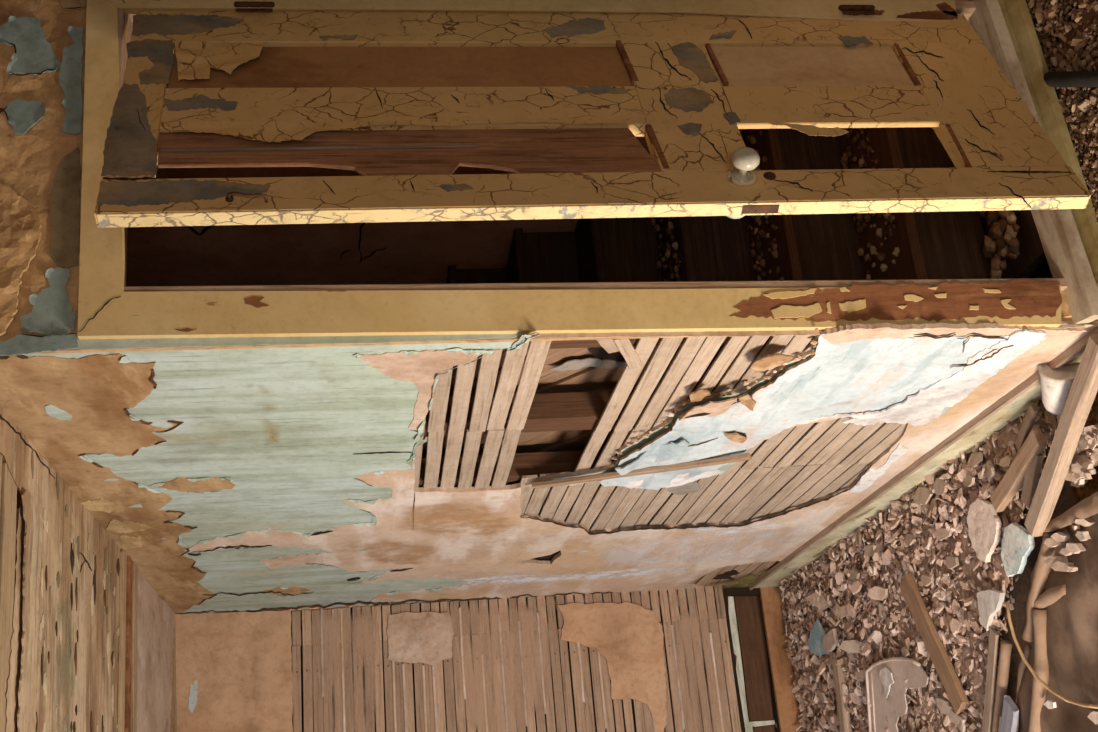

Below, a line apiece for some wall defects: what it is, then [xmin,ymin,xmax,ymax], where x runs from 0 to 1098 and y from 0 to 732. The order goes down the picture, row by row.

peeling [896,2,958,20]
crack [7,42,56,76]
crack [188,225,218,236]
peeling [0,278,1098,732]